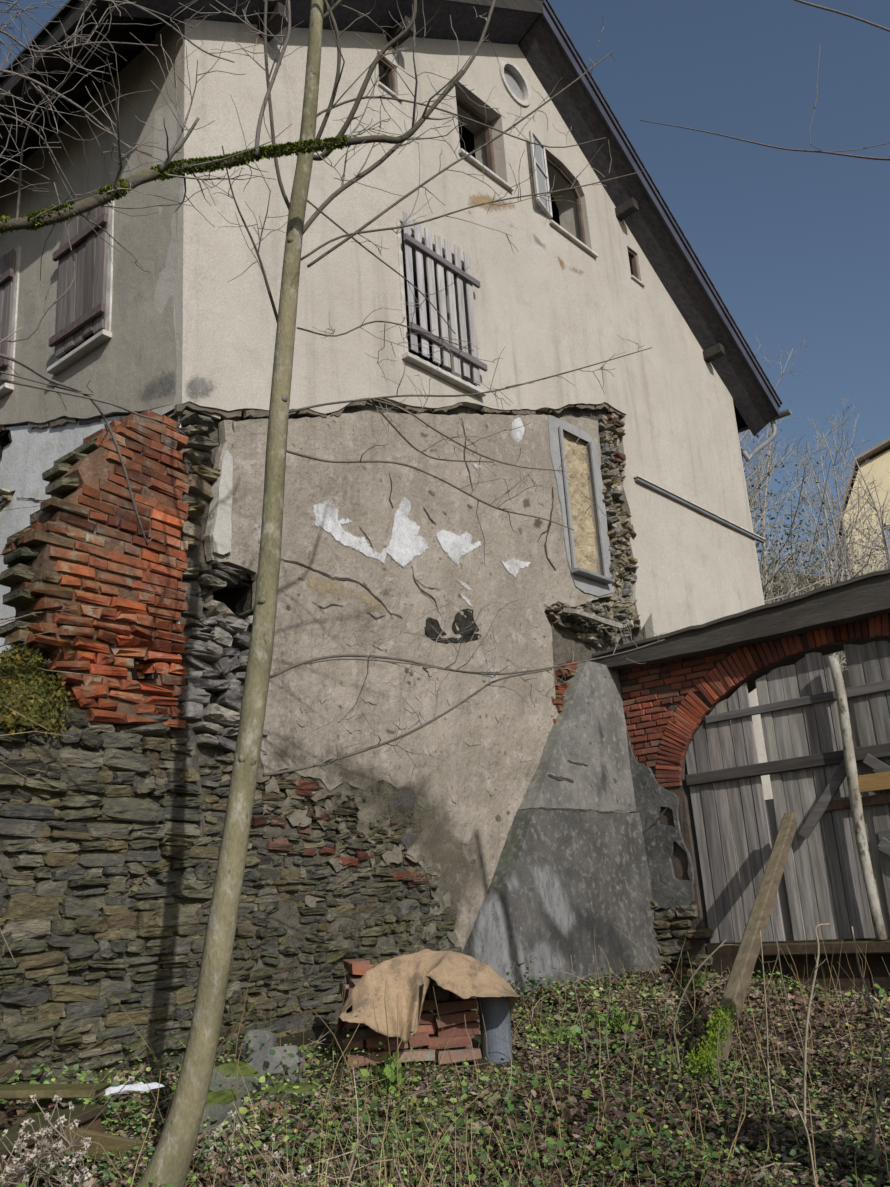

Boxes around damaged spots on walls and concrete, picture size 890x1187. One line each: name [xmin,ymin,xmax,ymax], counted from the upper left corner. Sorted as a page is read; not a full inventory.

flaking render [28,417,102,429]
damp [142,374,212,398]
flaking render [289,401,366,417]
flaking render [404,402,463,423]
peeling [314,497,481,570]
flaking render [481,403,641,648]
hole [131,658,158,680]
flaking render [169,402,269,882]
flaking render [424,579,482,643]
flaking render [223,730,462,1045]